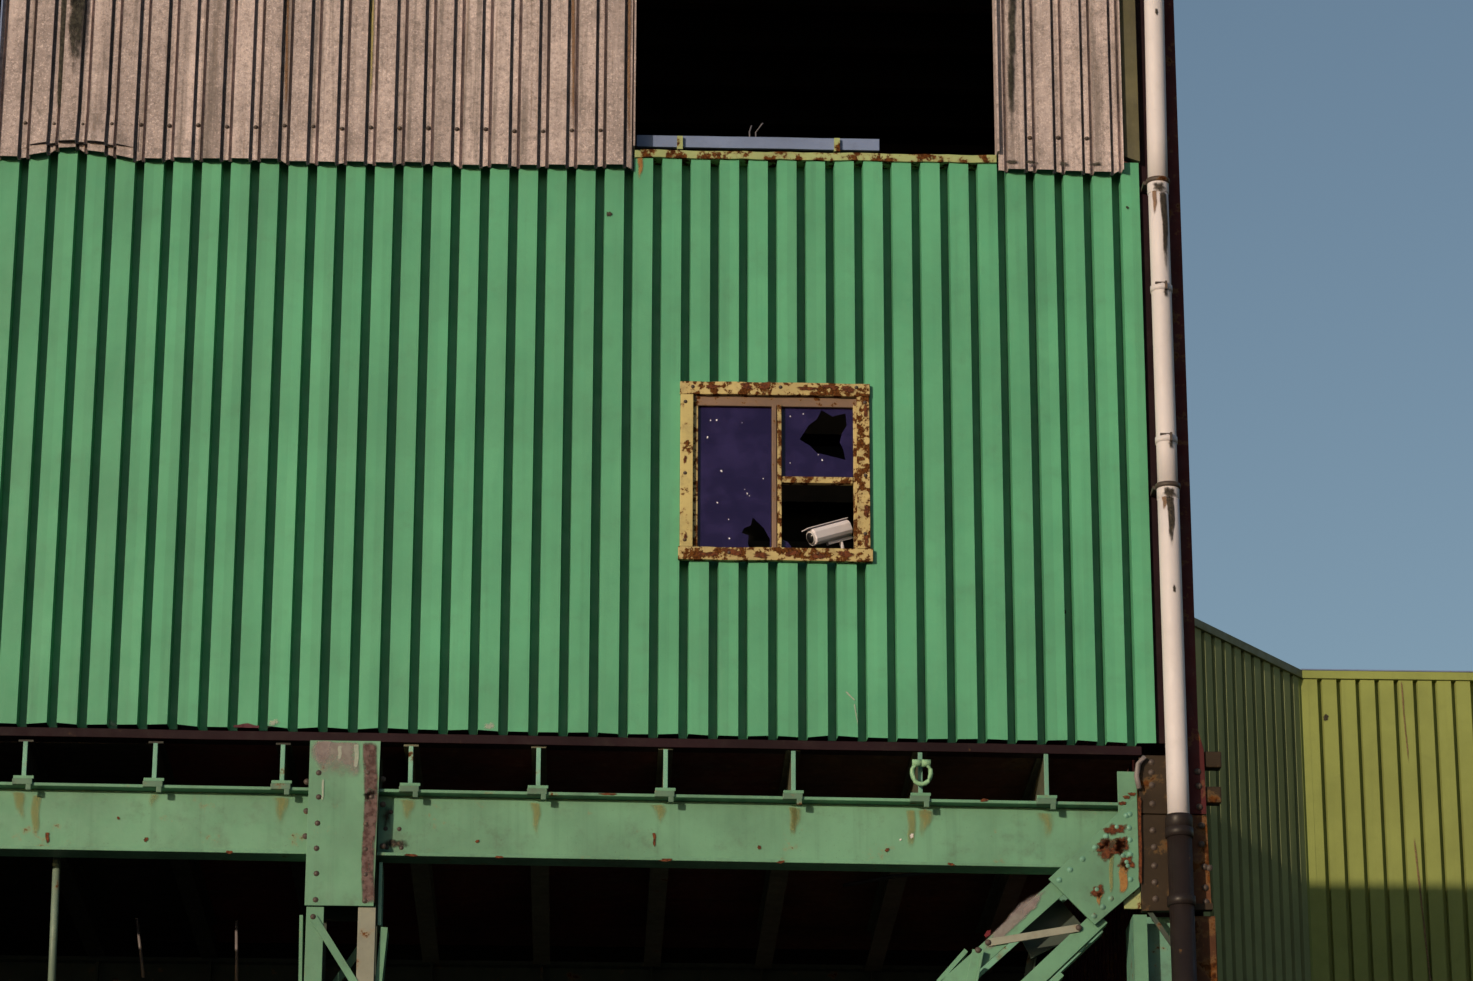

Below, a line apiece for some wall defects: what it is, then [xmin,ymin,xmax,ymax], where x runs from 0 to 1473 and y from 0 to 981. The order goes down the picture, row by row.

damp [57,0,85,106]
corrosion [797,385,868,417]
corrosion [698,535,869,559]
corrosion [1090,792,1142,904]